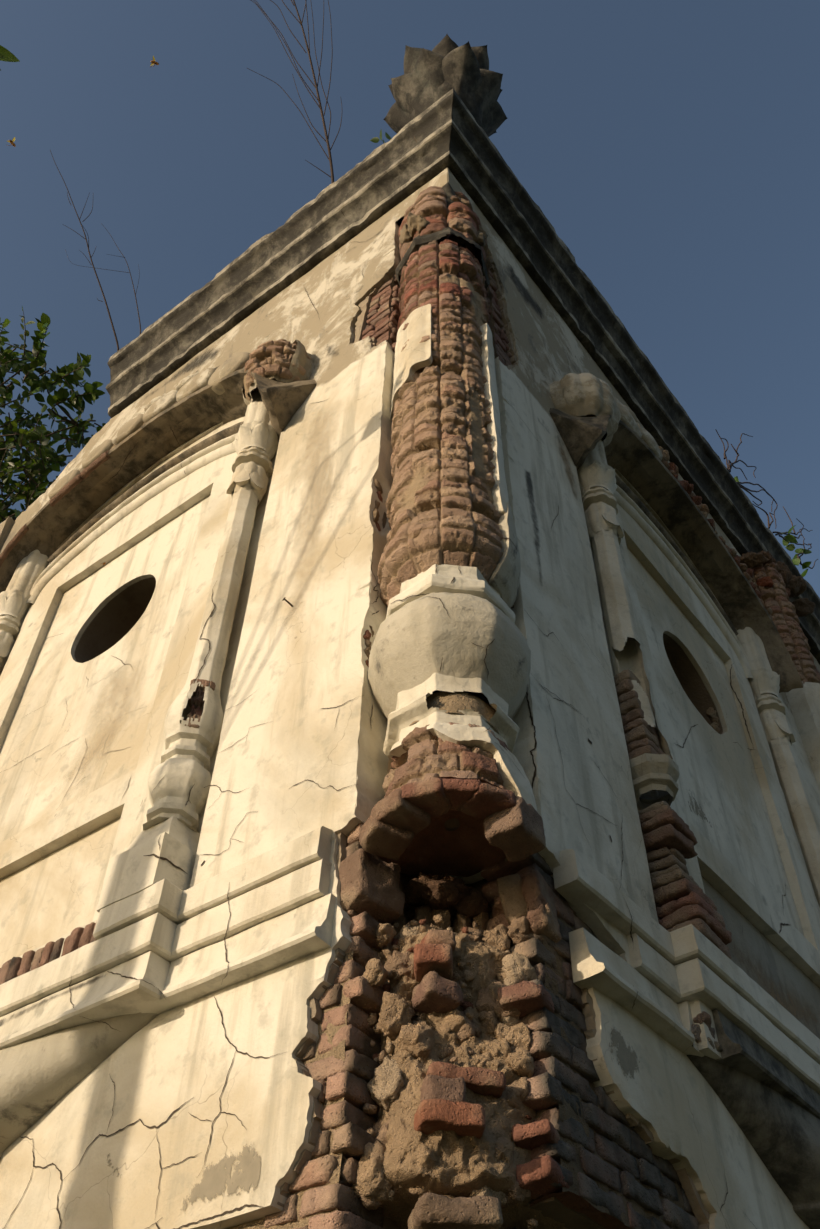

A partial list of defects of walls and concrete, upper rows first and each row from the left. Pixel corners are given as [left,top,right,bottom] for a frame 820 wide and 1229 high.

spalling [244,339,311,401]
spalling [354,186,512,608]
crack [0,657,141,817]
spalling [184,679,216,728]
crack [189,581,217,691]
spalling [658,446,820,790]
crack [144,785,250,873]
spalling [0,922,97,985]
spalling [227,691,699,1229]
crack [4,882,285,1229]